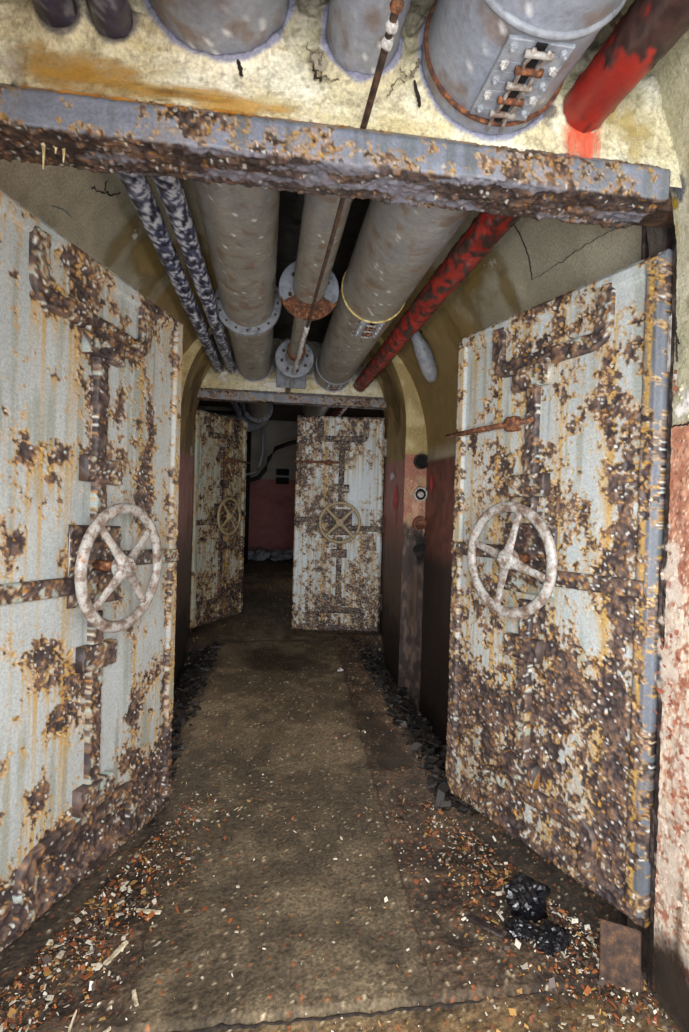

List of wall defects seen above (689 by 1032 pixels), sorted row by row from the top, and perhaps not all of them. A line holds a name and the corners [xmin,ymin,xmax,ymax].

rust [50,89,140,103]
rust [165,103,278,120]
rust [280,295,337,320]
peeling [654,525,689,910]
crack [142,726,182,952]
crack [172,640,552,1032]